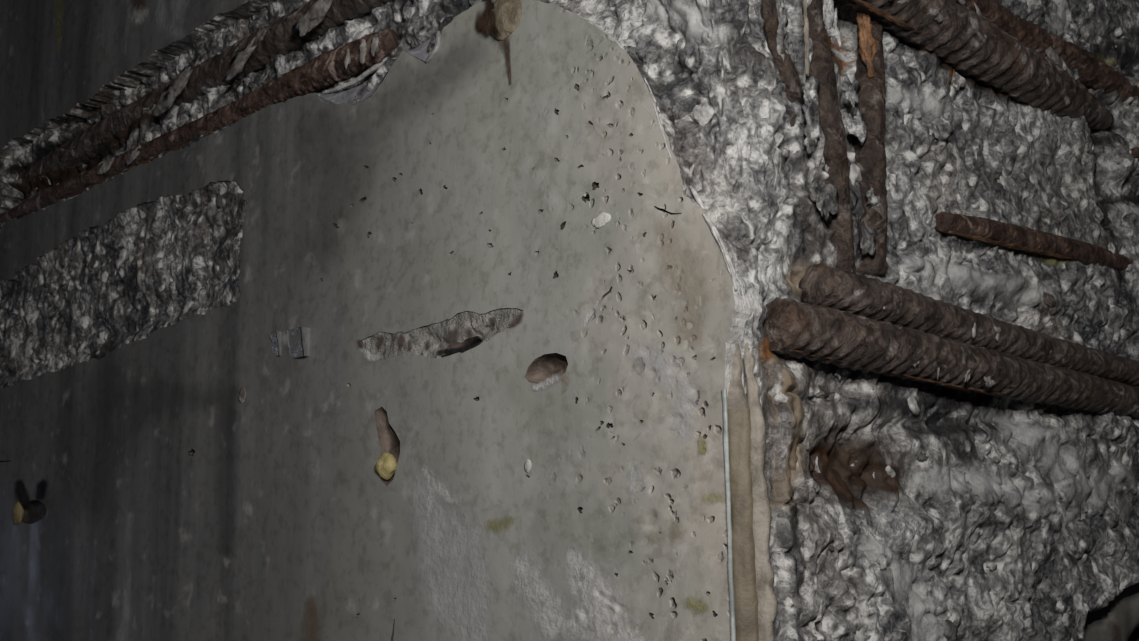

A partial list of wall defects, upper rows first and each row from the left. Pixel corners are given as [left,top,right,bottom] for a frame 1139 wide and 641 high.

rust [9,112,159,198]
spalling [0,0,486,229]
rust [822,9,853,74]
rust [911,44,1014,101]
spalling [0,181,248,389]
spalling [358,308,523,361]
spalling [538,0,1139,641]
rust [809,436,903,509]